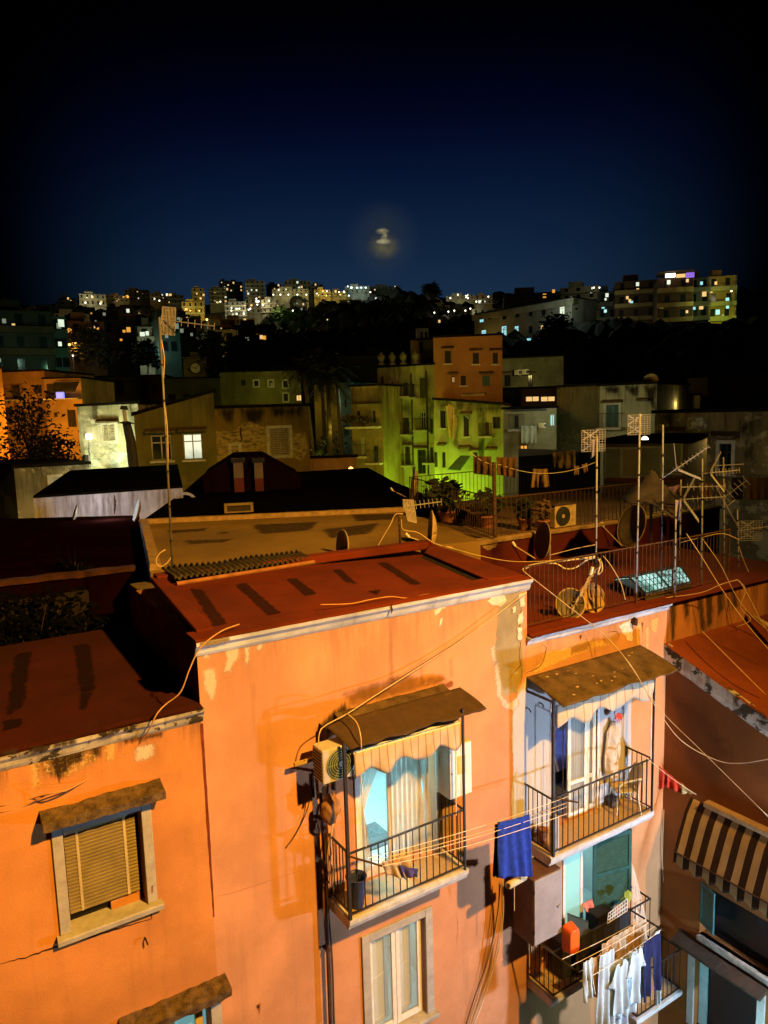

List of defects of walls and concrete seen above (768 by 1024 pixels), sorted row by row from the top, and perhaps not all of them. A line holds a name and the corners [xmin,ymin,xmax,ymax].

damp [670,588,737,641]
peeling [203,644,263,701]
peeling [487,591,525,711]
damp [31,731,162,786]